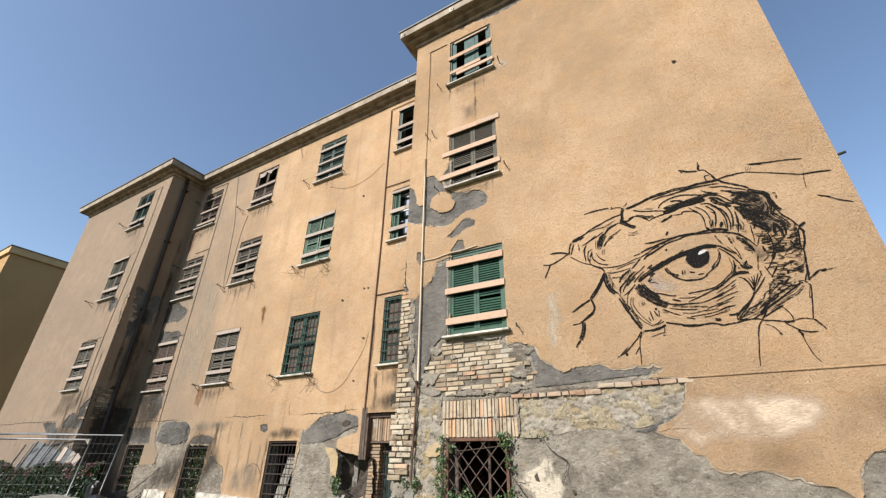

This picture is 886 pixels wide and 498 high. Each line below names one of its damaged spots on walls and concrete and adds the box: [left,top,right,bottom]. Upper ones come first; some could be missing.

peeling [408,160,488,261]
peeling [108,285,188,345]
flaking render [424,333,538,396]
peeling [126,392,223,498]